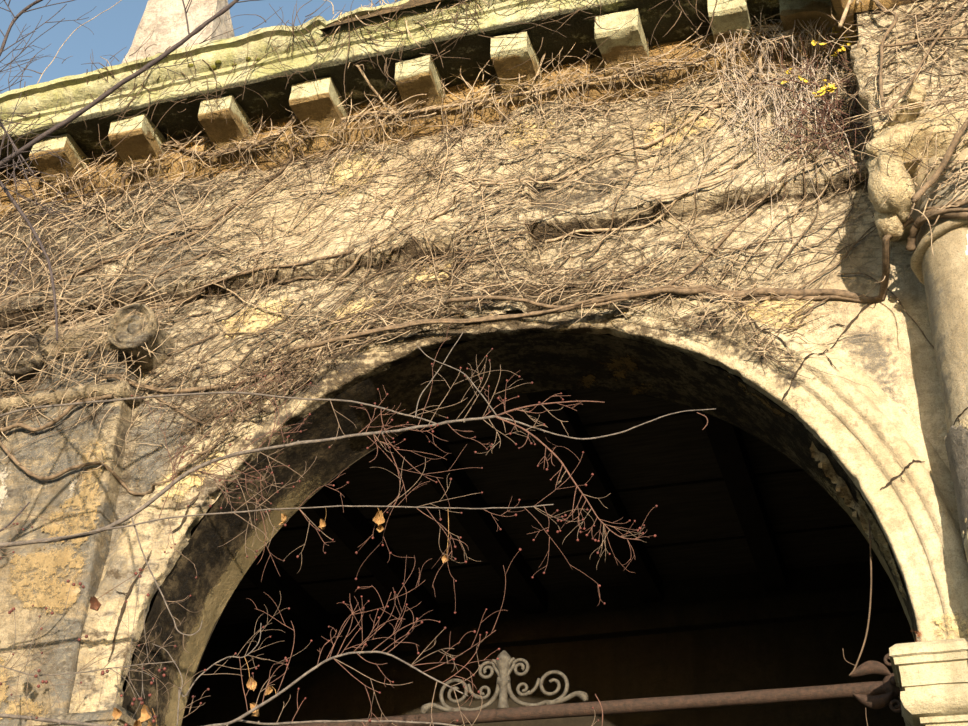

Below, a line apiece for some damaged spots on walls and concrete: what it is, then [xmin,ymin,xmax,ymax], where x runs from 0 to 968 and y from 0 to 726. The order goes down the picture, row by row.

peeling [7,440,108,614]
flaking render [809,442,907,601]
crack [880,459,925,490]
flaking render [944,415,968,562]